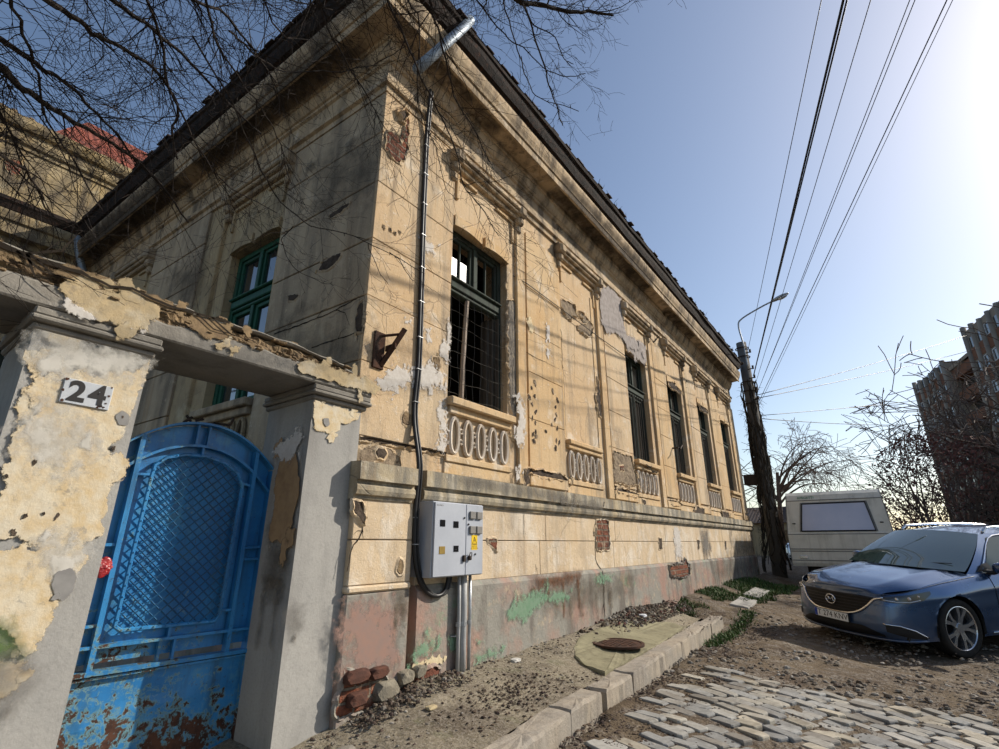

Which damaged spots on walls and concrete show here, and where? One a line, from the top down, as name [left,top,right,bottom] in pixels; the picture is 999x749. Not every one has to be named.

flaking render [383,107,410,165]
flaking render [560,286,647,366]
flaking render [214,317,452,466]
peeling [504,282,560,451]
flaking render [0,256,192,699]
flaking render [269,426,304,567]
flaking render [349,498,368,527]
flaking render [593,518,611,553]
flaking render [668,557,692,579]